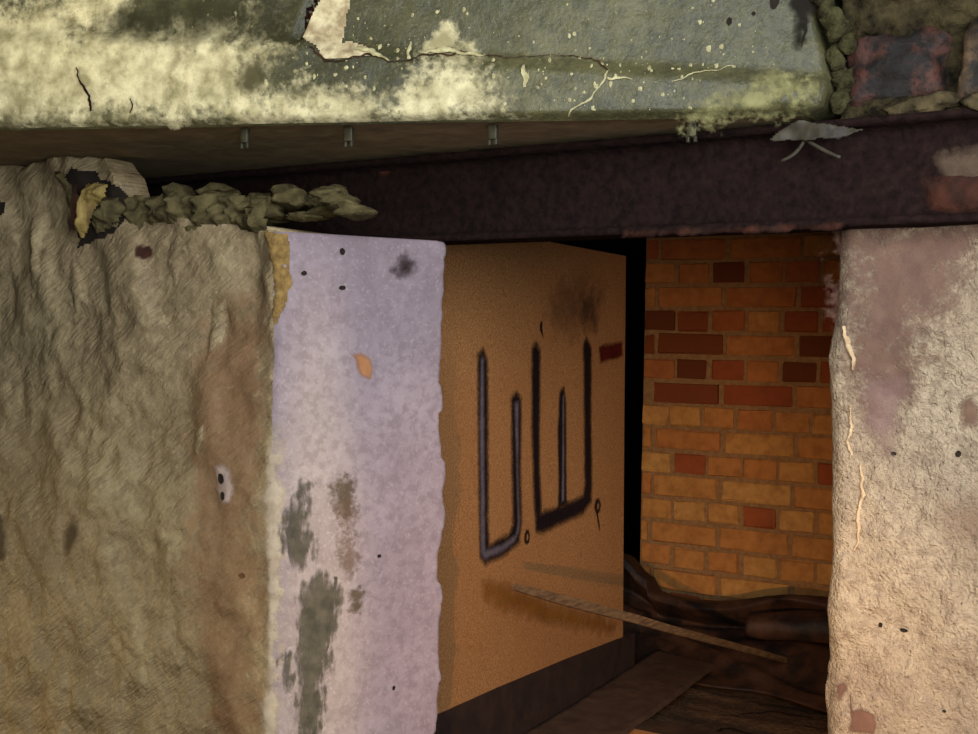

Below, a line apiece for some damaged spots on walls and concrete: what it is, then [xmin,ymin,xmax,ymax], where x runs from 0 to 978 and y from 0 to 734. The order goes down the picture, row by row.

crack [75,67,92,111]
peeling [0,0,514,128]
crack [297,0,631,117]
rust [922,148,978,213]
rust [623,224,794,236]
leakage [279,481,314,568]
leakage [330,474,360,570]
leakage [277,572,363,734]
peeling [838,683,876,734]